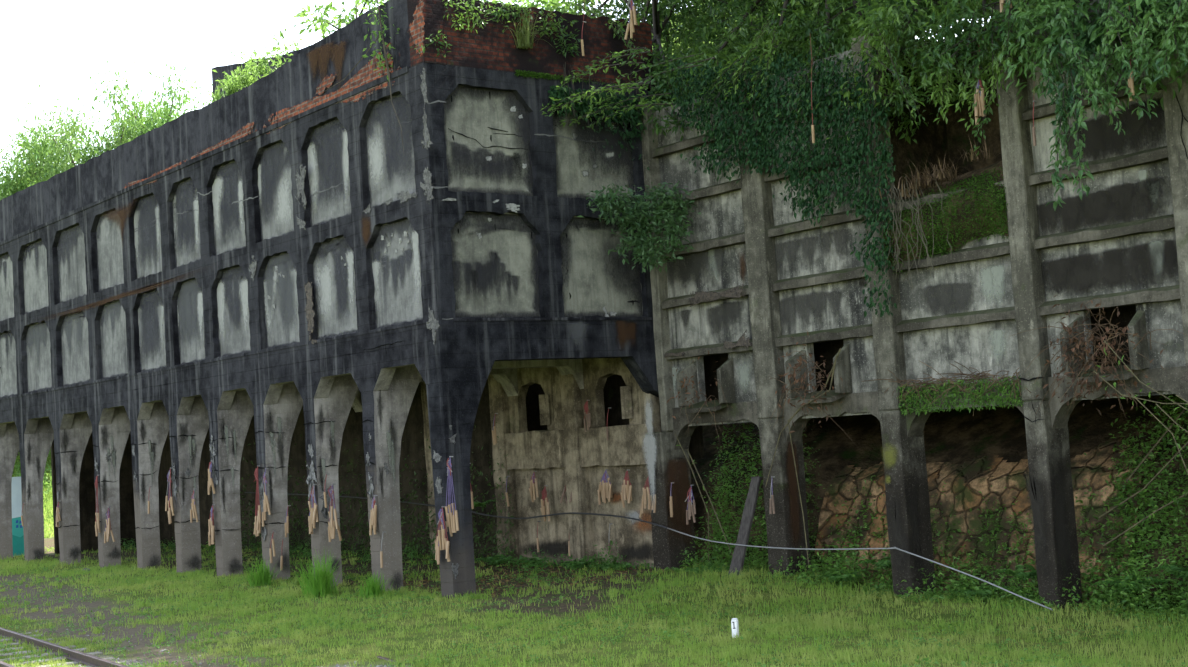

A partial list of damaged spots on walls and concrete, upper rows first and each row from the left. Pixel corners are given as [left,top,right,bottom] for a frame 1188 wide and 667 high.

flaking render [123,42,401,189]
flaking render [409,0,433,150]
water stain [443,86,533,196]
water stain [1062,98,1165,161]
water stain [1036,170,1164,232]
water stain [451,212,541,318]
water stain [560,217,643,345]
water stain [1041,240,1177,293]